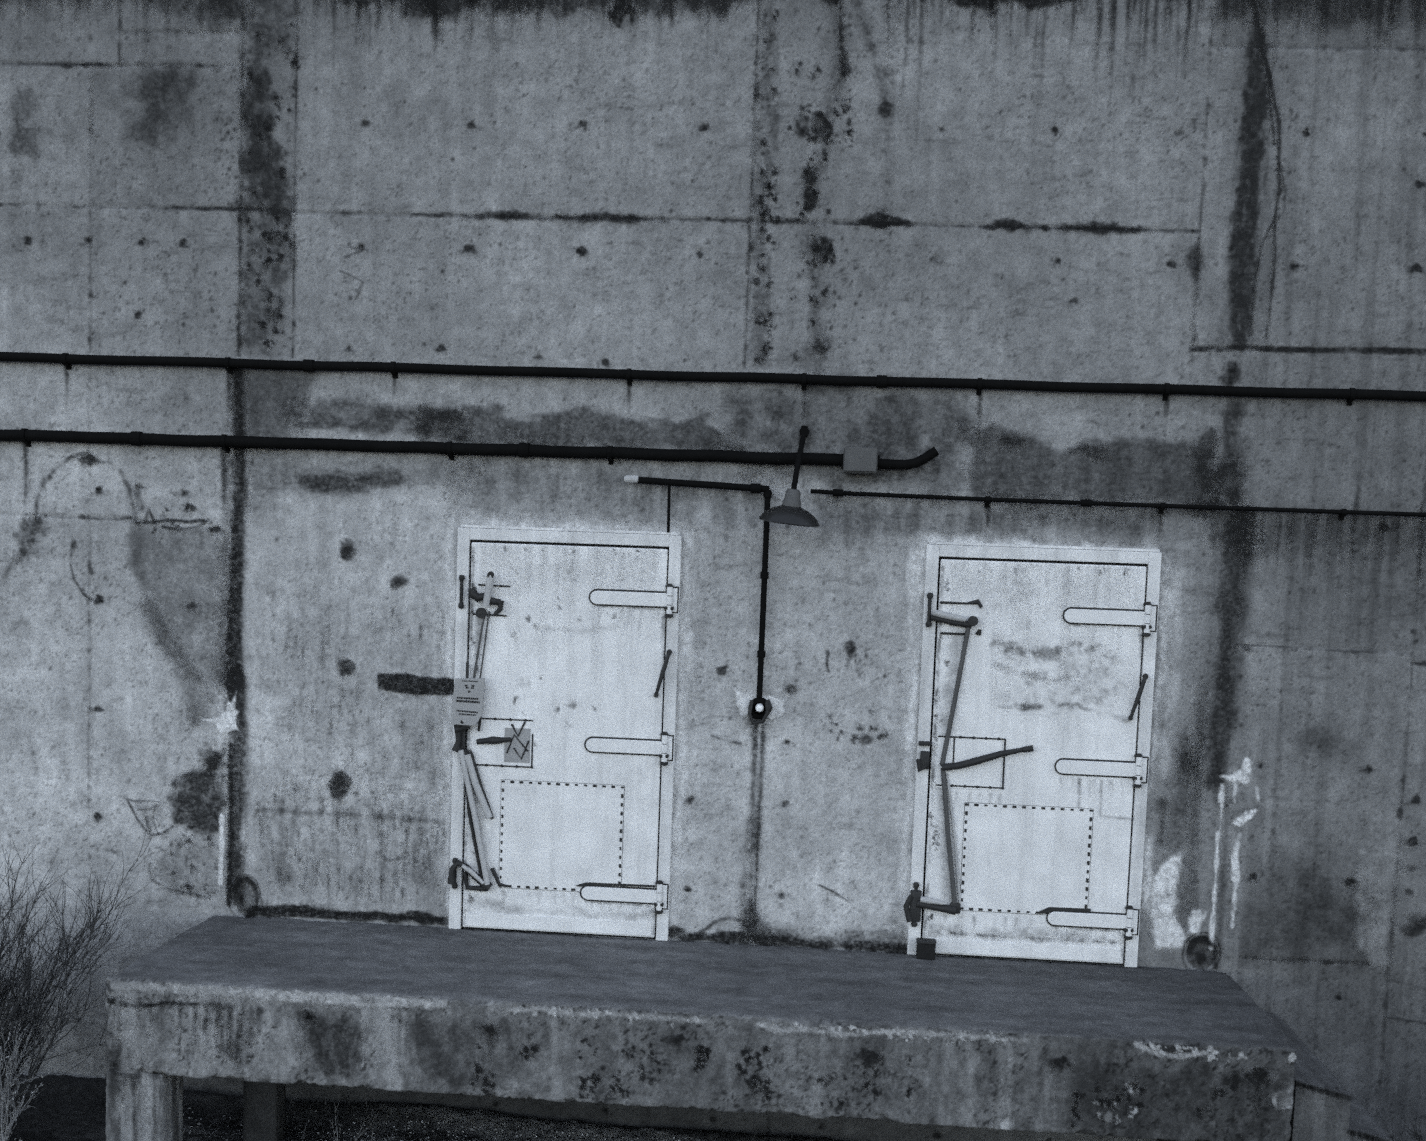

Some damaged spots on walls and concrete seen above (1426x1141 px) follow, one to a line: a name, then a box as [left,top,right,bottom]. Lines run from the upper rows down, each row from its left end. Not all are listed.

leakage [332,0,743,39]
leakage [131,65,197,145]
crack [1250,0,1286,338]
leakage [468,210,665,223]
leakage [66,454,103,465]
leakage [824,0,1422,843]
leakage [8,472,52,569]
leakage [125,368,850,925]
leakage [668,906,907,954]
leakage [1401,916,1426,936]